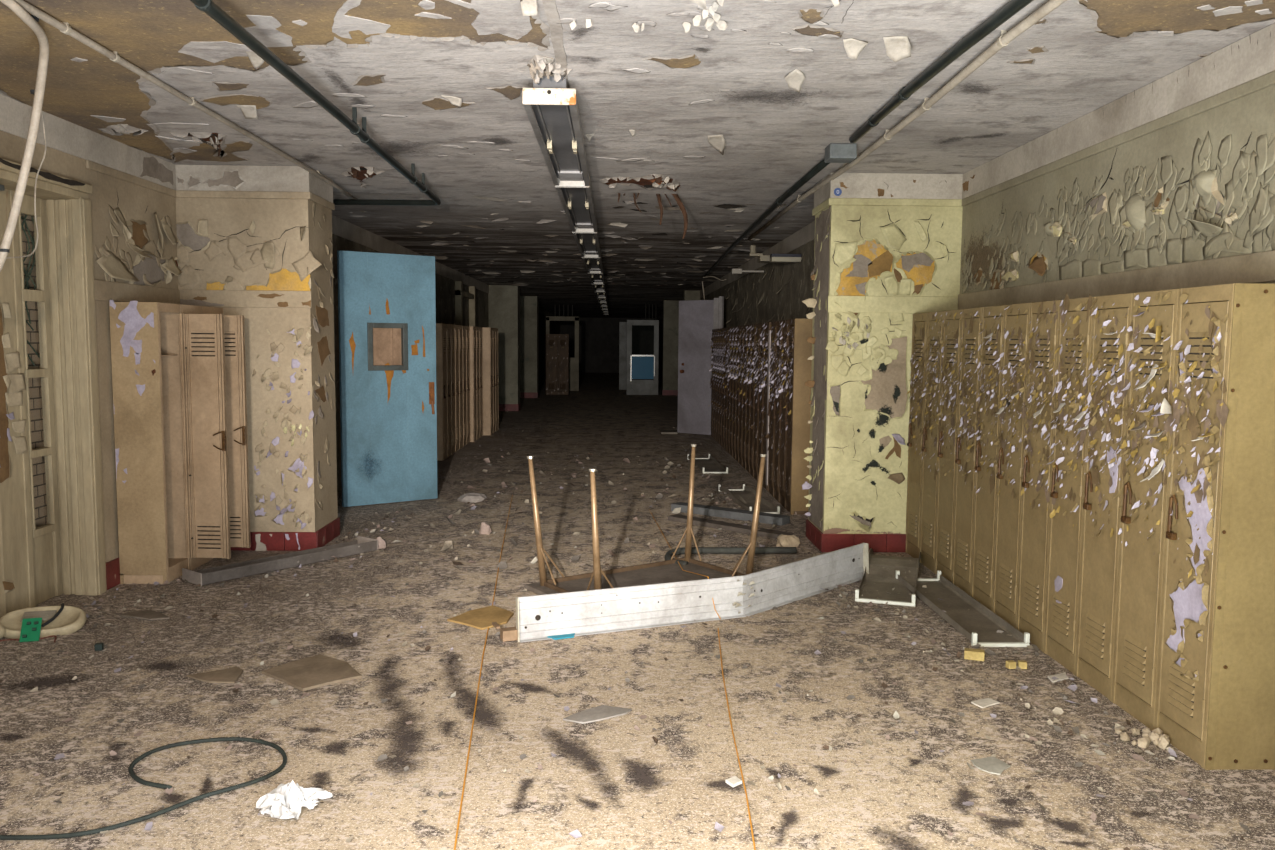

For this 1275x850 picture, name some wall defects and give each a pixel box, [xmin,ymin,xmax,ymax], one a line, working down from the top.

peeling [0,0,628,189]
peeling [622,54,702,74]
peeling [632,0,745,38]
peeling [784,69,805,93]
peeling [769,0,868,60]
peeling [883,36,911,63]
peeling [1073,0,1275,38]
peeling [391,196,585,286]
crack [832,182,974,290]
peeling [0,303,27,484]
peeling [95,202,334,551]
peeling [591,131,1275,666]